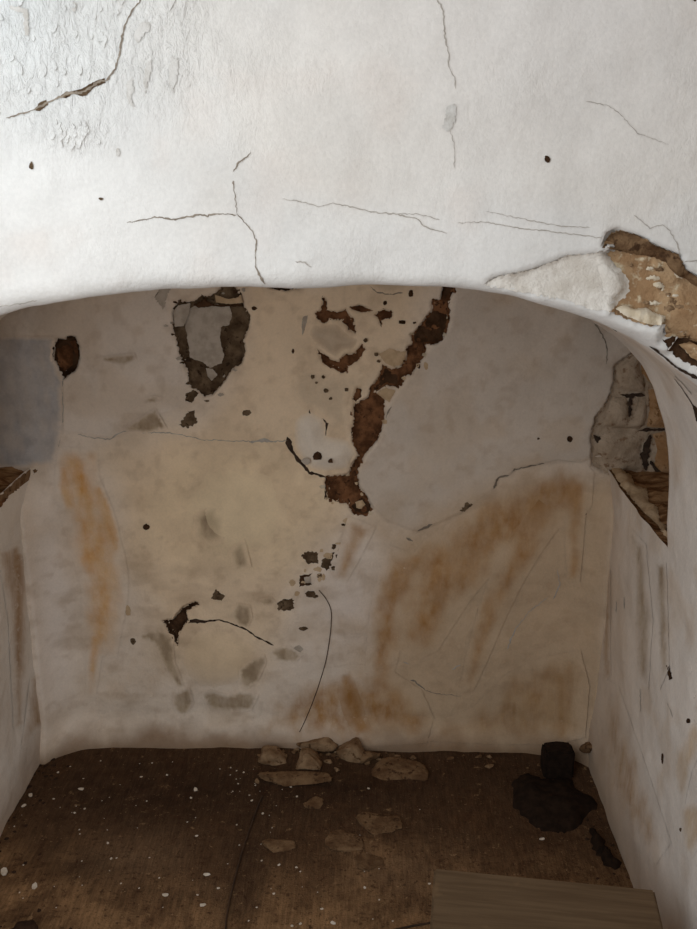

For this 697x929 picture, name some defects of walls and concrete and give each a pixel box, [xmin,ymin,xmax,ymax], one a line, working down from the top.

crack [7,0,141,118]
crack [437,0,456,88]
crack [127,153,265,284]
spalling [483,230,697,342]
spalling [155,287,257,428]
spalling [302,285,456,526]
spalling [590,353,669,537]
crack [649,346,697,421]
rust [54,446,129,696]
spalling [277,542,341,611]